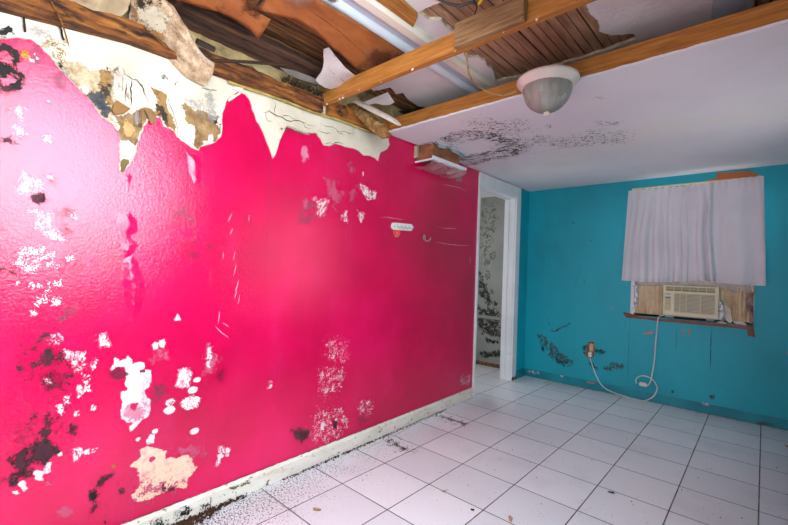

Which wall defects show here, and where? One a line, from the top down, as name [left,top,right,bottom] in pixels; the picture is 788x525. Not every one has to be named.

mould [0,42,27,94]
flaking render [0,12,390,174]
crack [265,106,350,144]
flaking render [418,0,506,32]
leakage [439,115,634,165]
flaking render [464,5,636,81]
peeling [13,209,74,317]
mould [477,201,503,358]
mould [2,406,79,496]
mould [16,332,74,392]
peeling [109,339,207,505]
peeling [314,333,349,443]